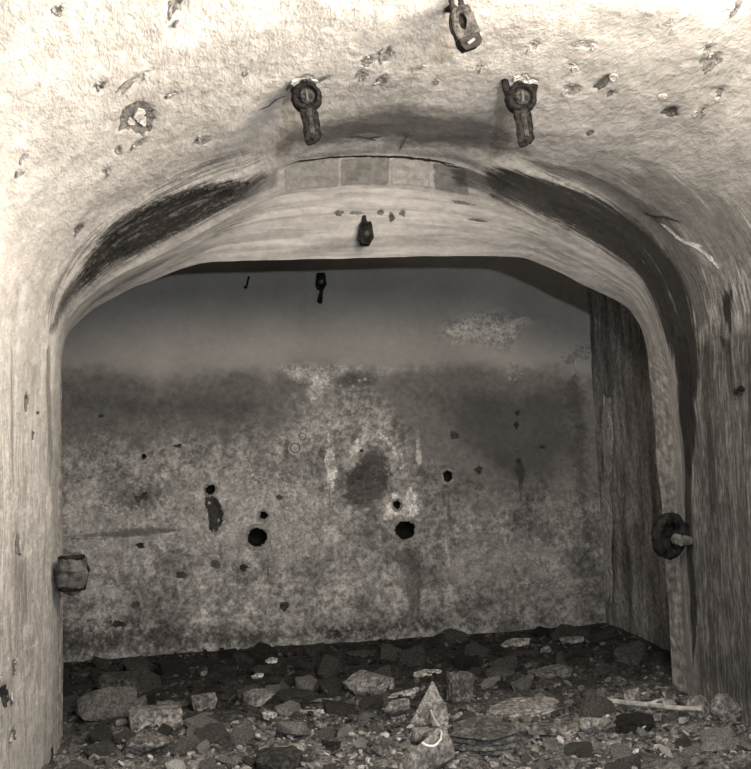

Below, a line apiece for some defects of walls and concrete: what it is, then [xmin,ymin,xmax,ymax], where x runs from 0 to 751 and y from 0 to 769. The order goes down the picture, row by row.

spalling [115,102,156,155]
leakage [108,154,276,256]
leakage [285,365,379,408]
leakage [439,160,705,663]
leakage [324,421,419,525]
spalling [0,676,15,708]